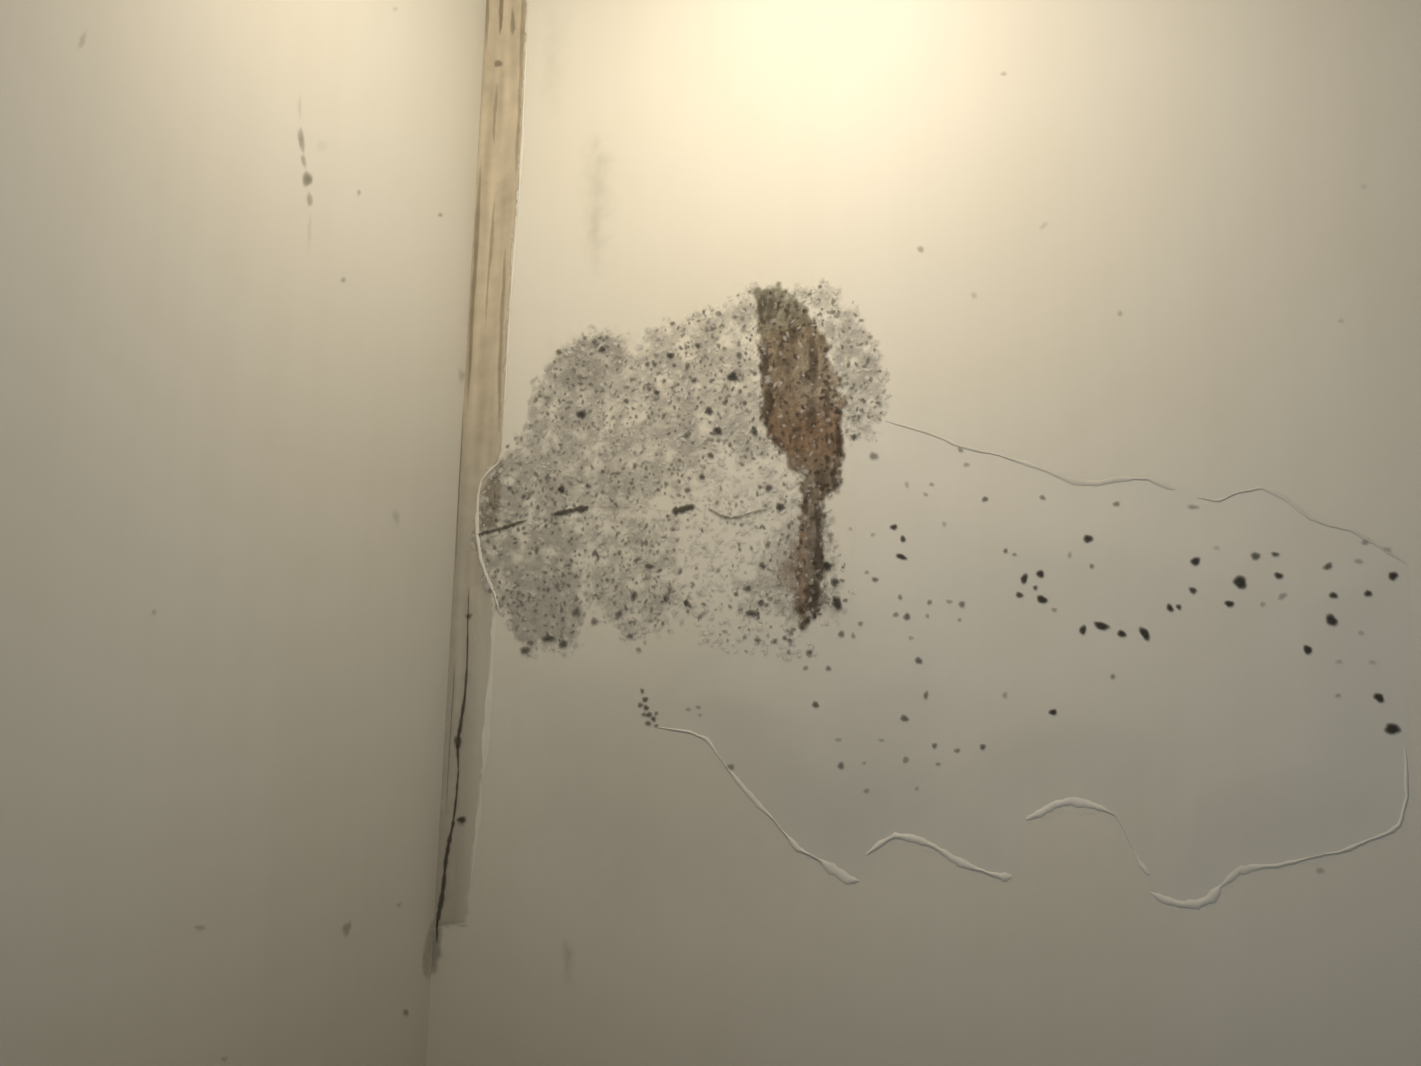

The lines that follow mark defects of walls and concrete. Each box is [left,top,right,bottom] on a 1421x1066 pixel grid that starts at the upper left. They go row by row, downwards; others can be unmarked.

corrosion [754,282,847,628]
water stain [1016,570,1047,602]
water stain [1225,576,1246,606]
water stain [1080,622,1149,640]
water stain [1385,724,1400,733]
crack [436,600,471,939]